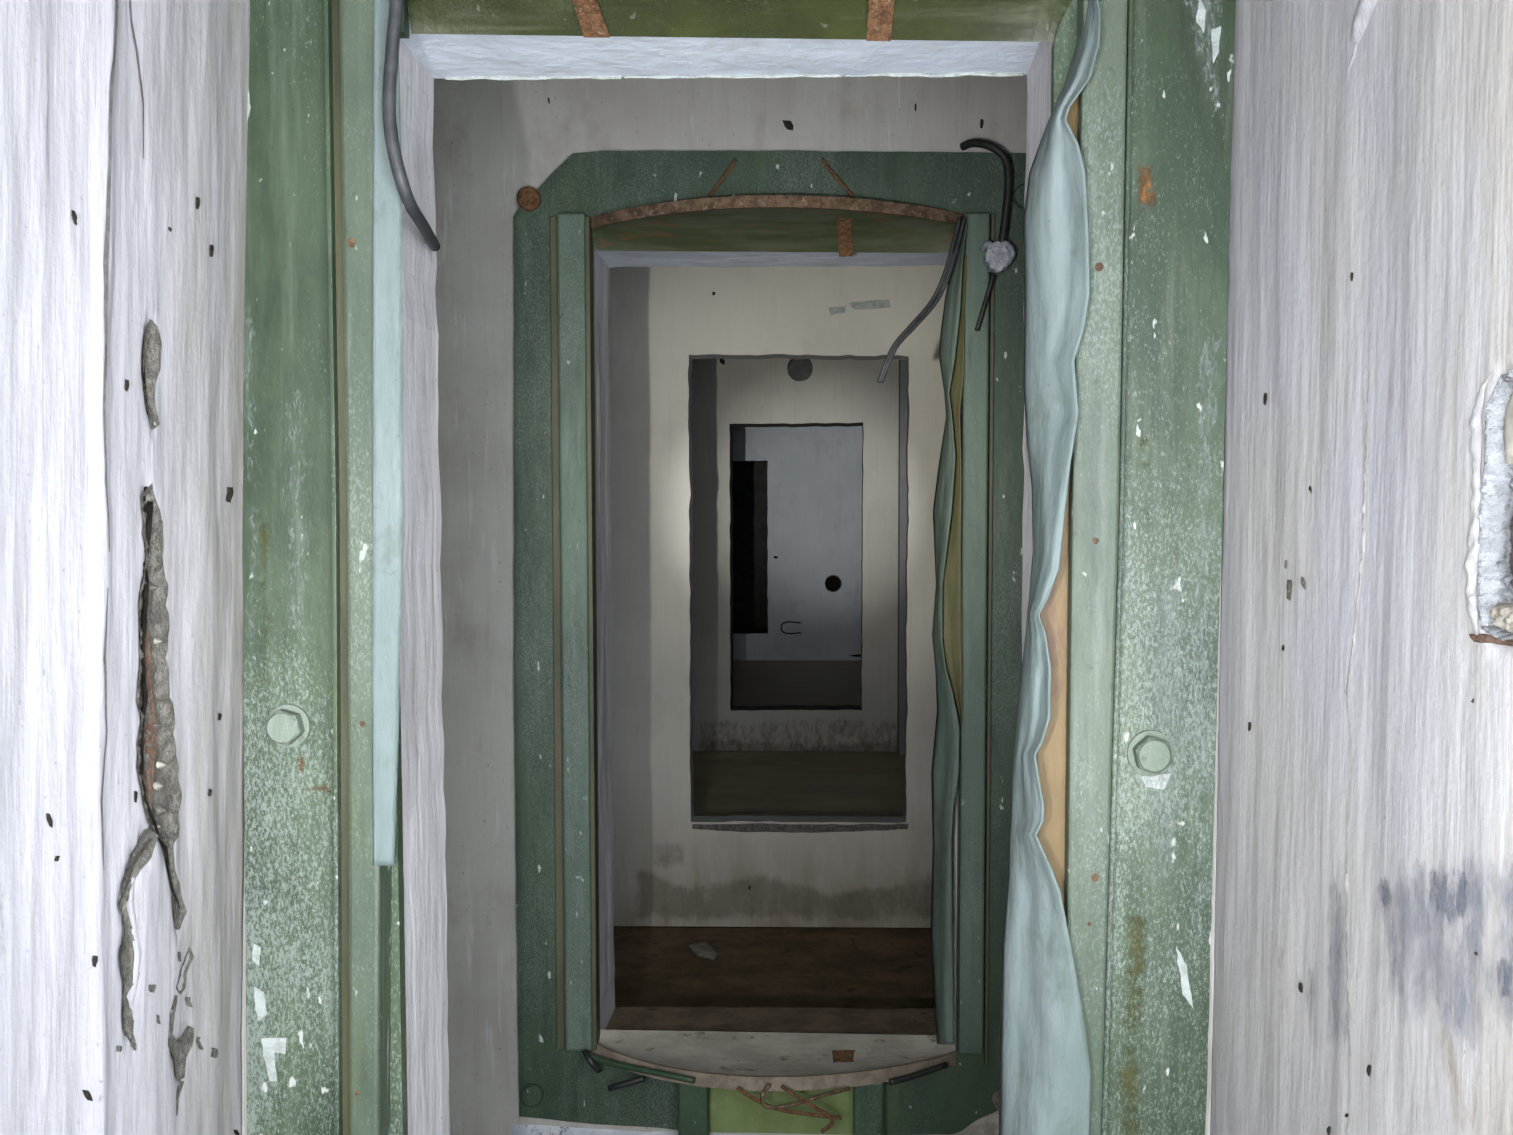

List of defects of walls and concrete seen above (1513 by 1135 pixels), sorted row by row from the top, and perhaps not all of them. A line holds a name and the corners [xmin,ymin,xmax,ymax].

spalling [141,319,162,430]
spalling [1462,369,1513,646]
leakage [1381,873,1482,1026]
leakage [1497,961,1513,1012]